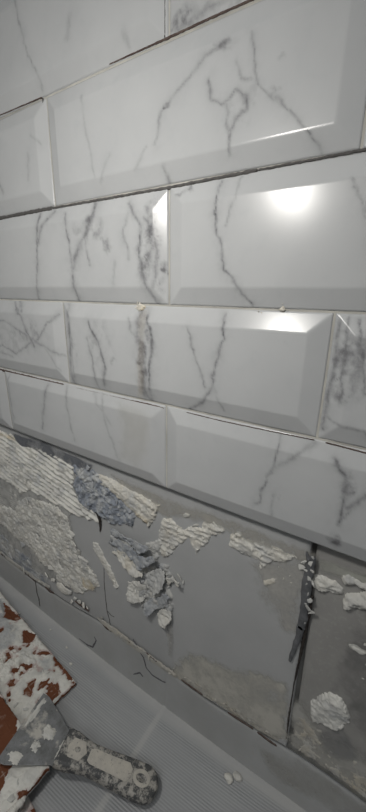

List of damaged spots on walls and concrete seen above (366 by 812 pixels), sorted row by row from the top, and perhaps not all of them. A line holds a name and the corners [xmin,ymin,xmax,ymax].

peeling [287,555,315,624]